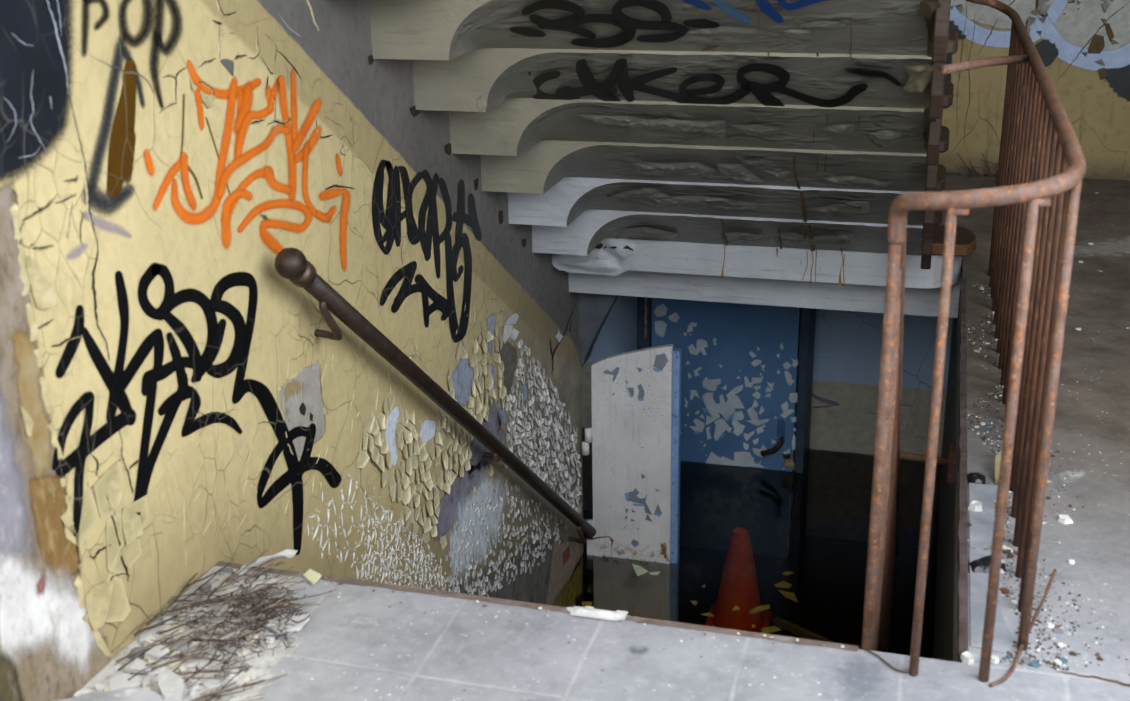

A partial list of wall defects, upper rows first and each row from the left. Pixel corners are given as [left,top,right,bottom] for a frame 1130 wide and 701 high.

crack [159,0,346,156]
peeling [1081,0,1118,80]
crack [7,0,110,361]
crack [325,183,355,191]
spalling [0,182,149,701]
crack [88,430,141,582]
peeling [226,304,582,605]
crack [550,305,576,372]
peeling [603,353,668,401]
peeling [624,473,662,547]
peeling [654,304,799,468]
crack [1056,671,1130,686]